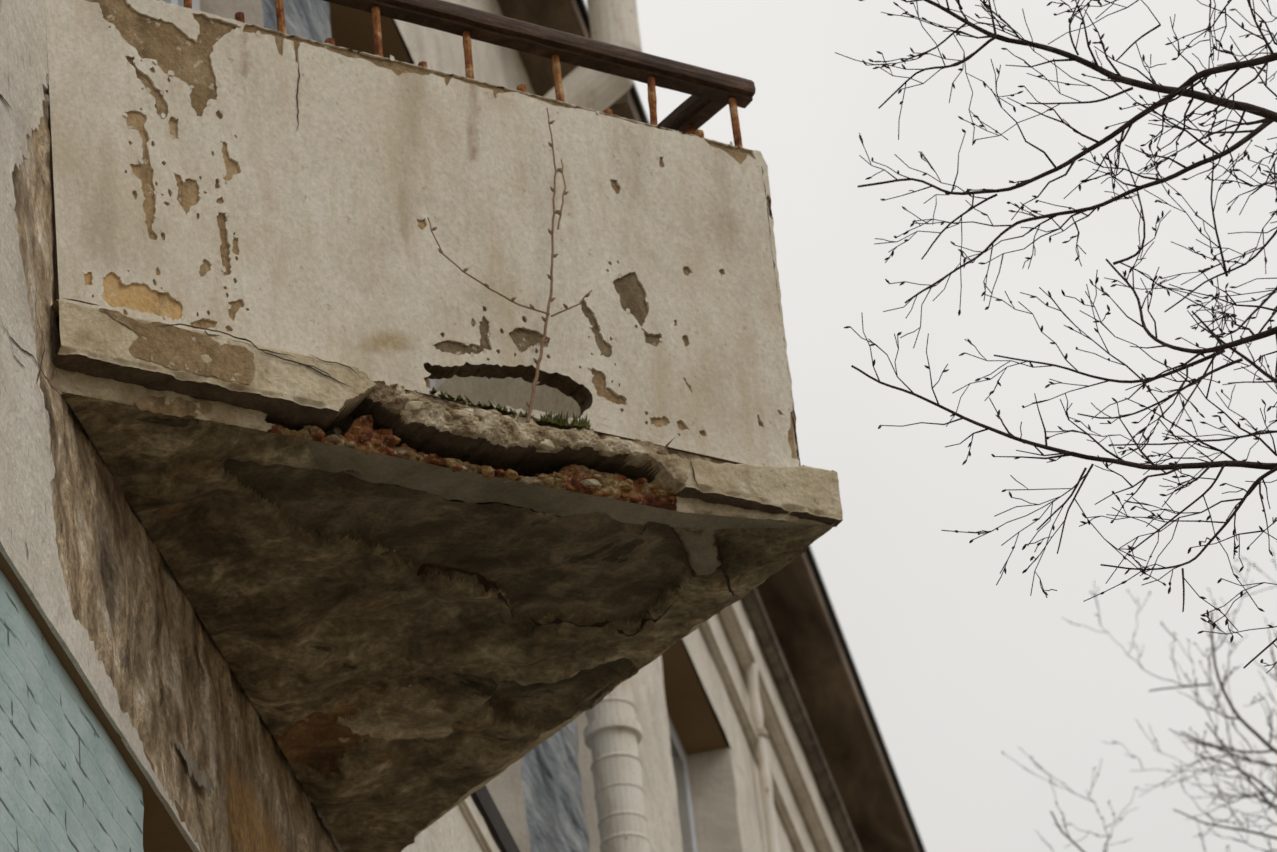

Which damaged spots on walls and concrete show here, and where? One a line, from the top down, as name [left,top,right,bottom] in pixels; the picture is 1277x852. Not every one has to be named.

crack [161,323,360,389]
spalling [52,0,843,629]
crack [436,495,561,517]
crack [407,522,738,637]